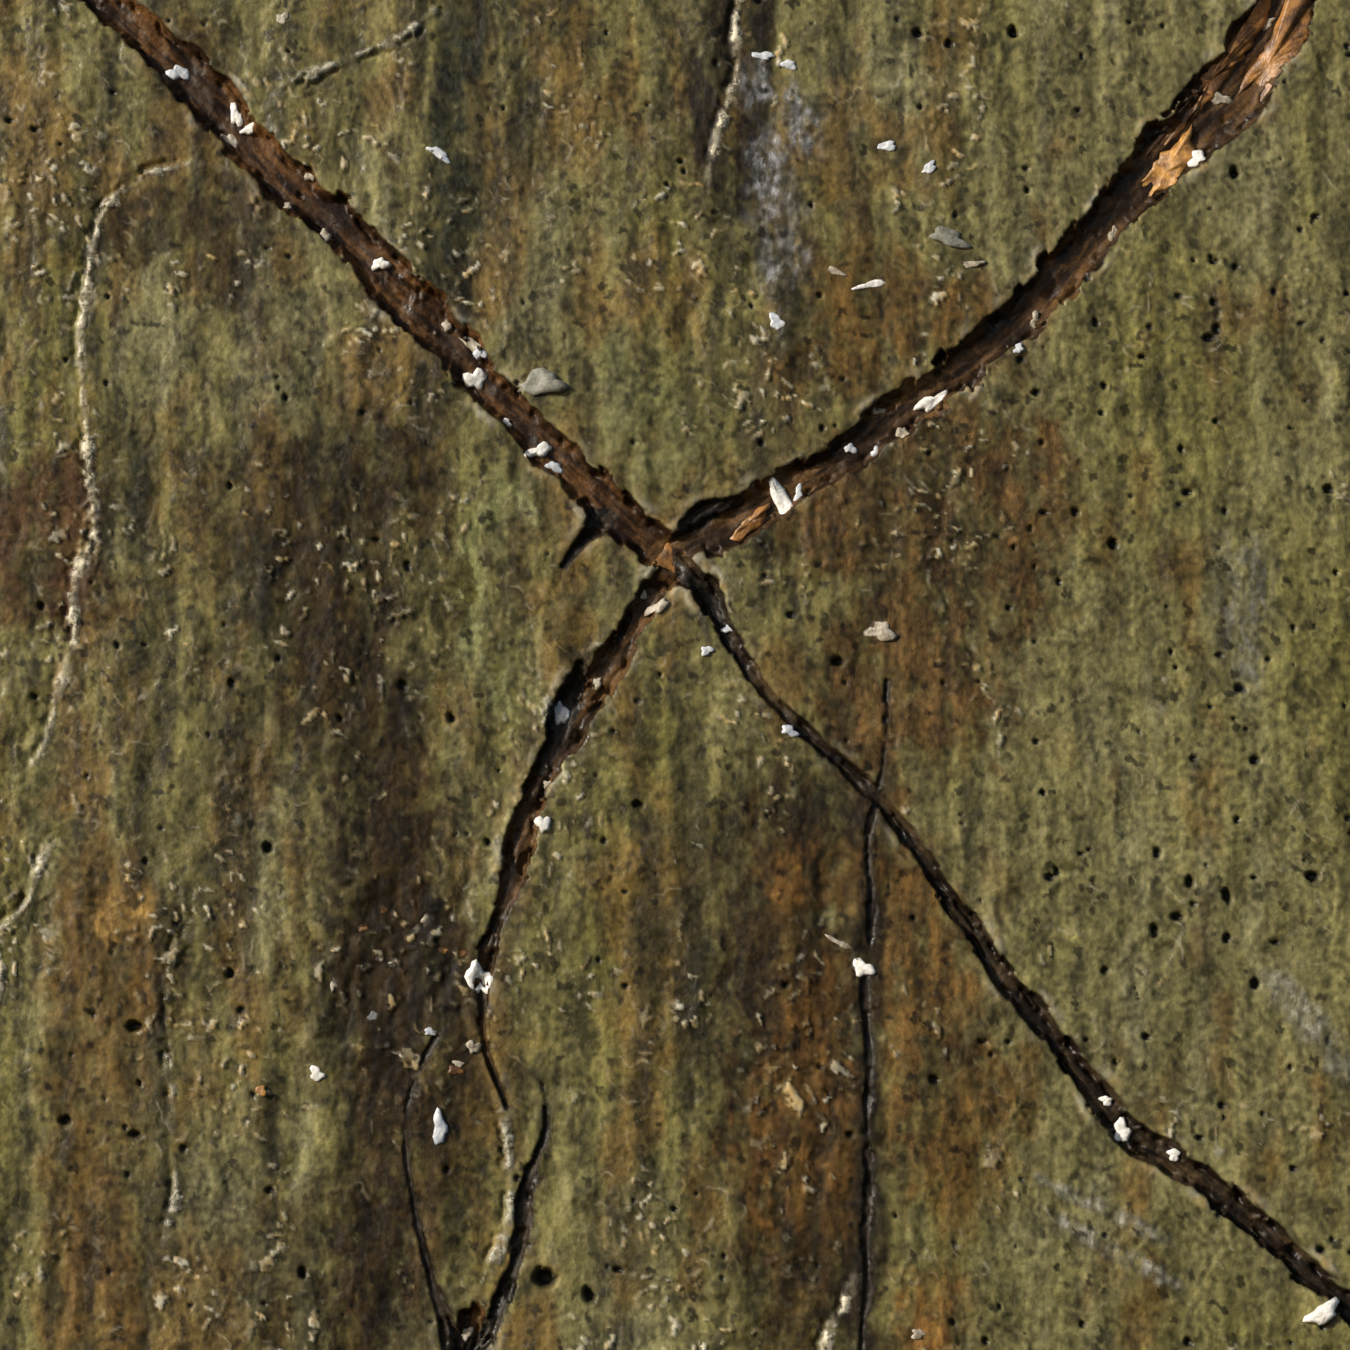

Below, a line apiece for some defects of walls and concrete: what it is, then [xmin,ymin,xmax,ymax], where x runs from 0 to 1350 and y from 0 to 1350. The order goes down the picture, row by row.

crack [42,676,69,755]
crack [68,426,99,645]
water stain [125,433,147,562]
crack [77,0,1317,1110]
crack [0,857,46,993]
crack [167,1179,183,1226]
water stain [222,409,480,1350]
crack [402,1024,550,1350]
water stain [695,759,886,1350]
crack [821,975,876,1350]
crack [863,678,1350,1326]